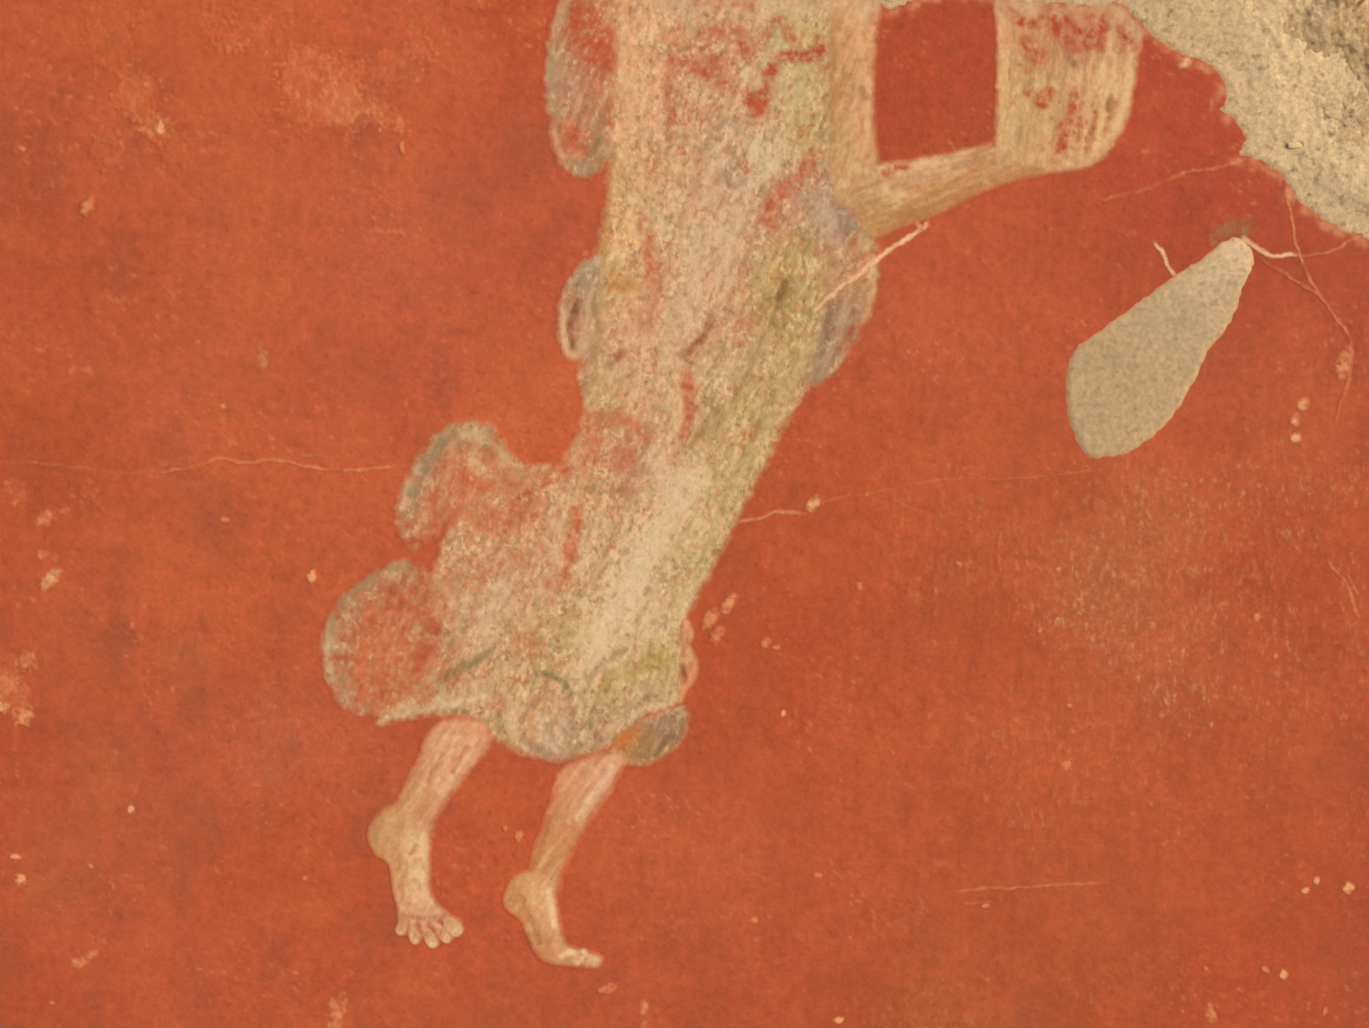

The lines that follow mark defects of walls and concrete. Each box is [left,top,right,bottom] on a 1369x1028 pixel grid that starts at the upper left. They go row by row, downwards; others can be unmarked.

peeling [190,0,441,155]
peeling [156,118,165,135]
crack [1096,156,1251,204]
crack [1150,239,1177,278]
crack [1240,180,1363,427]
peeling [1332,342,1357,384]
crack [0,455,405,476]
crack [739,465,1121,524]